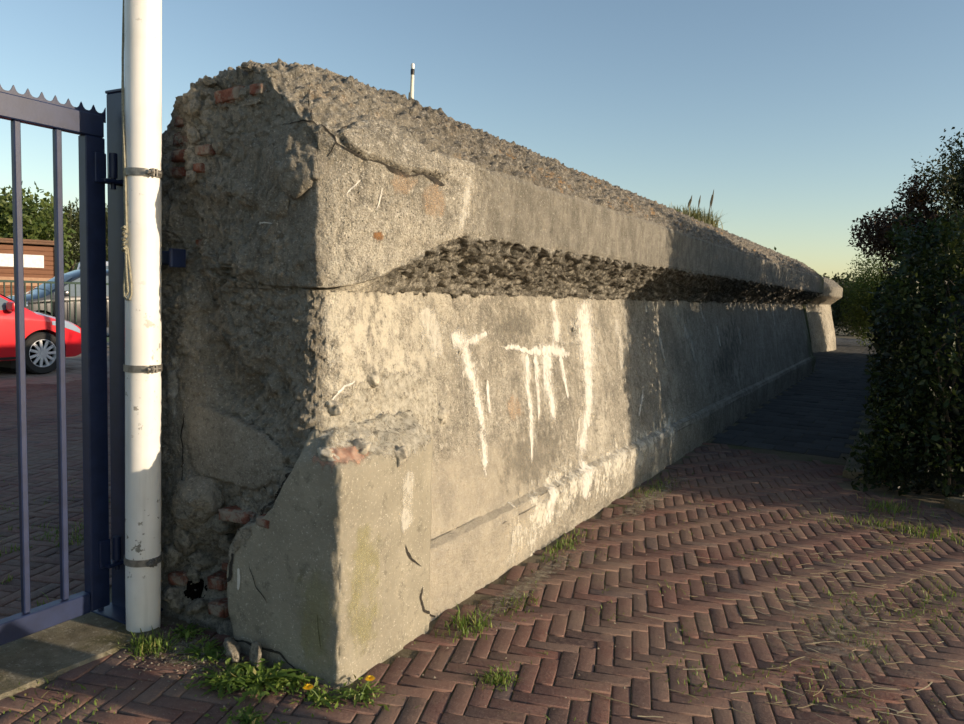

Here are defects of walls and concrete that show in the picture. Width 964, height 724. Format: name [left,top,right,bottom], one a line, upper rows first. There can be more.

spalling [169,62,278,205]
crack [282,87,445,186]
spalling [162,403,290,670]